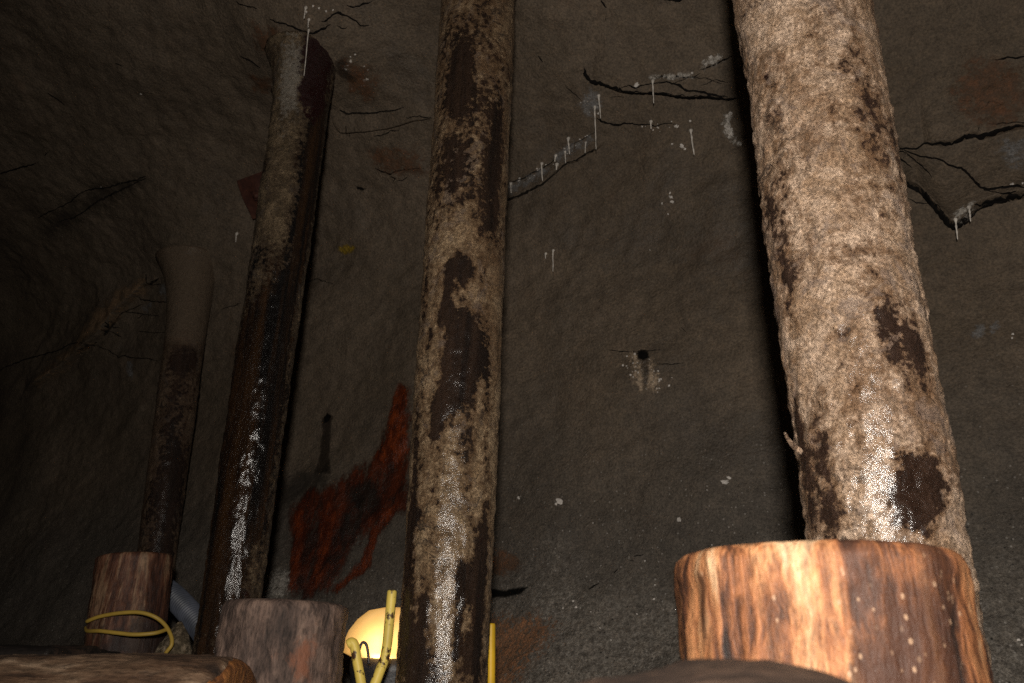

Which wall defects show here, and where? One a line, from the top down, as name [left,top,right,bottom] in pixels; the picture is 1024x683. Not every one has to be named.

crack [235,1,372,34]
crack [995,54,1024,62]
damp [634,72,693,87]
crack [507,56,737,201]
damp [721,111,742,145]
crack [899,100,1024,230]
rust [288,383,411,600]